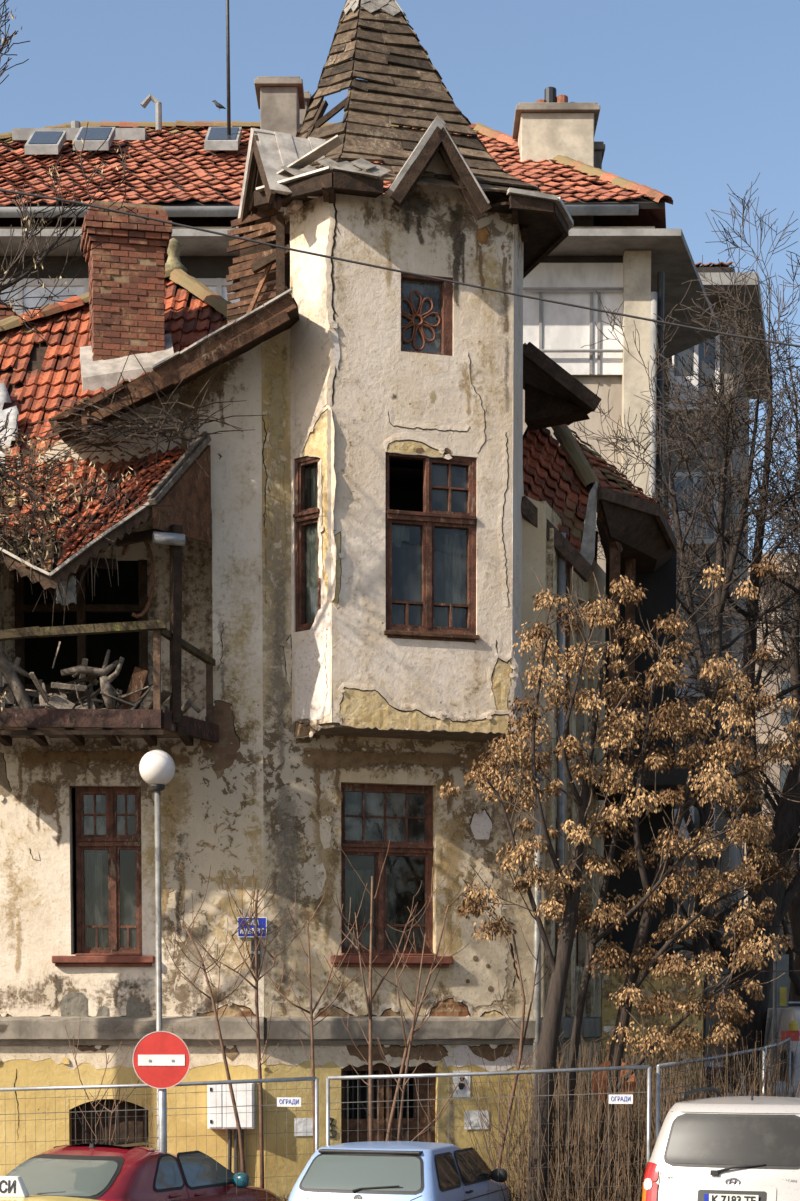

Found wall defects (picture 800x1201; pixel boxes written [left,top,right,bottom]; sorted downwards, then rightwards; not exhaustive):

damp [404,192,431,244]
damp [450,209,466,306]
damp [494,235,510,270]
crack [315,201,341,417]
peeling [297,405,349,609]
spalling [0,743,17,802]
peeling [292,652,519,892]
peeling [425,803,509,1017]
spalling [190,999,261,1017]
spalling [313,999,358,1017]
spalling [375,1002,404,1016]